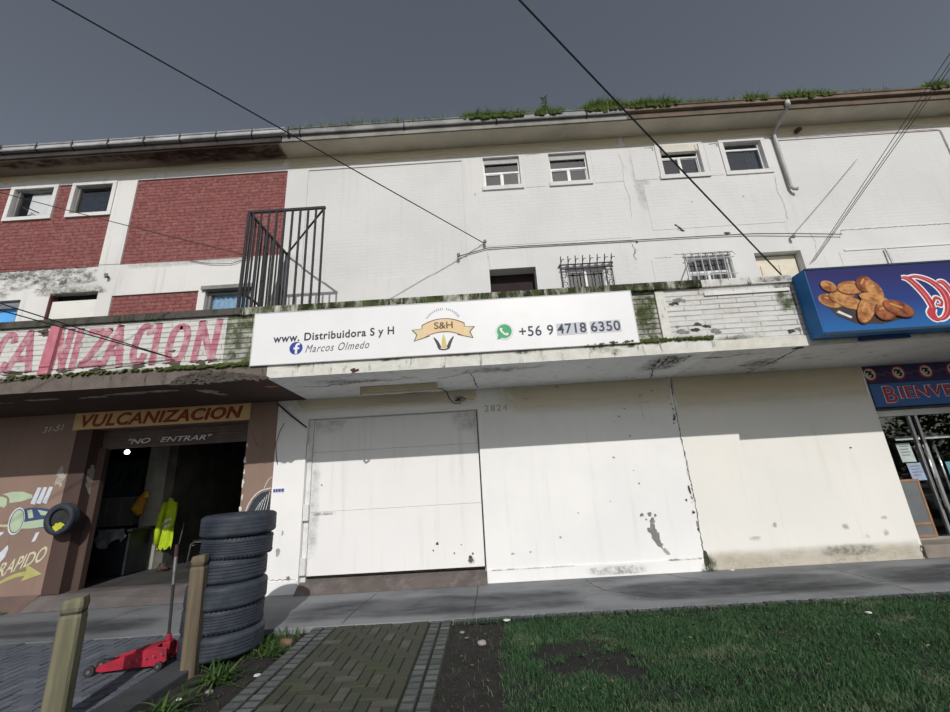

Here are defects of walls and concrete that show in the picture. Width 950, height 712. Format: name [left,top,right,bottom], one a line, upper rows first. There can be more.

leakage [0,268,103,296]
leakage [638,296,656,332]
peeling [675,322,722,334]
spalling [79,349,278,399]
leakage [510,355,865,403]
crack [670,380,709,569]
spalling [640,512,670,555]